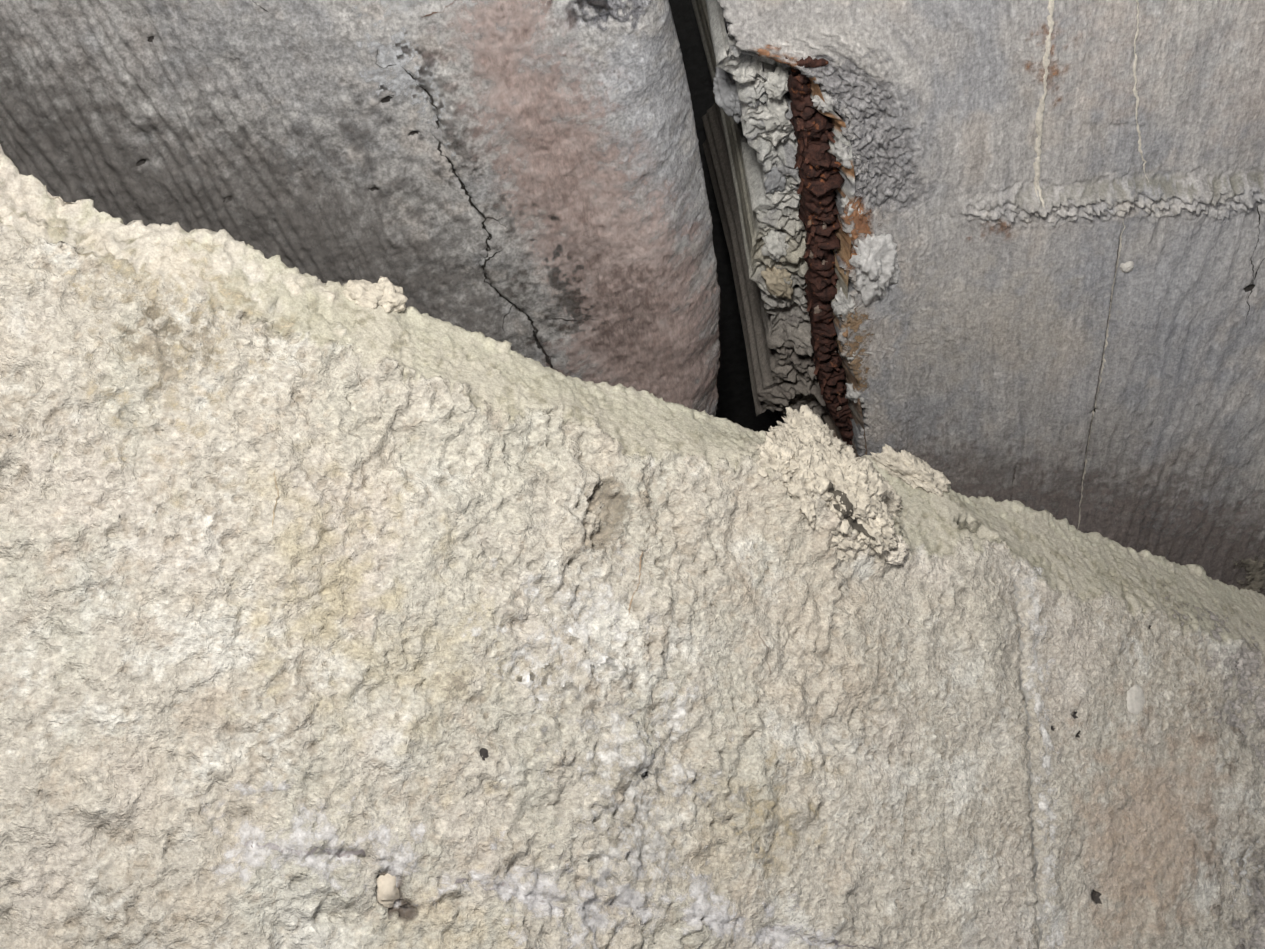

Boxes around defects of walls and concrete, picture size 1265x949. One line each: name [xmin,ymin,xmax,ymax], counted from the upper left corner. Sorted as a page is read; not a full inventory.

crack [376,49,594,368]
corrosion [458,0,720,415]
spalling [691,0,933,457]
corrosion [834,196,872,272]
corrosion [836,308,874,392]
crack [628,552,643,613]
crack [215,781,875,949]
crack [1013,567,1064,948]